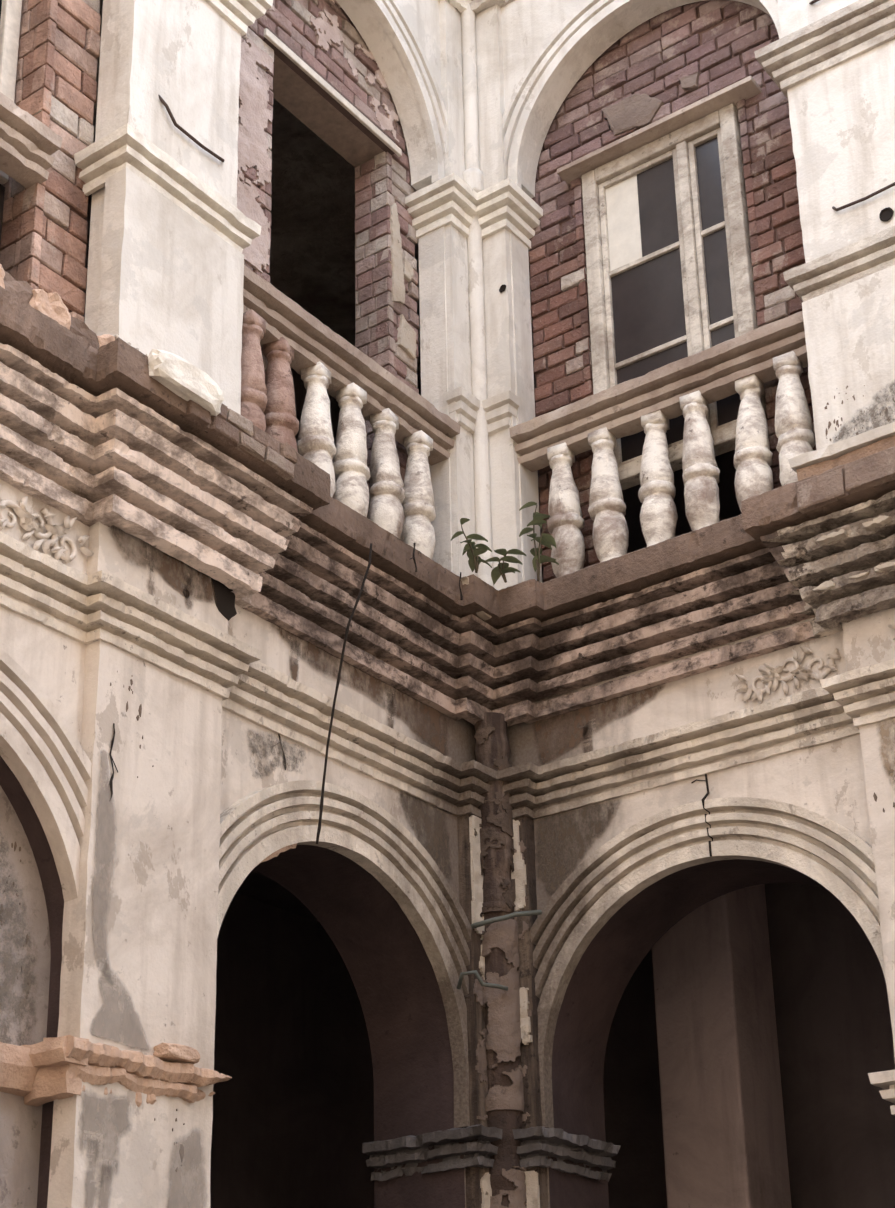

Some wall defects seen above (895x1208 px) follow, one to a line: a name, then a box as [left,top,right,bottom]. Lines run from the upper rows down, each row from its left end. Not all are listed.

peeling [310,0,399,143]
peeling [237,38,273,273]
water stain [835,383,895,441]
crack [109,723,118,800]
crack [691,774,713,857]
water stain [879,720,895,782]
water stain [0,840,35,1046]
water stain [92,751,149,1050]
peeling [469,756,532,1122]
peeling [480,1166,540,1208]